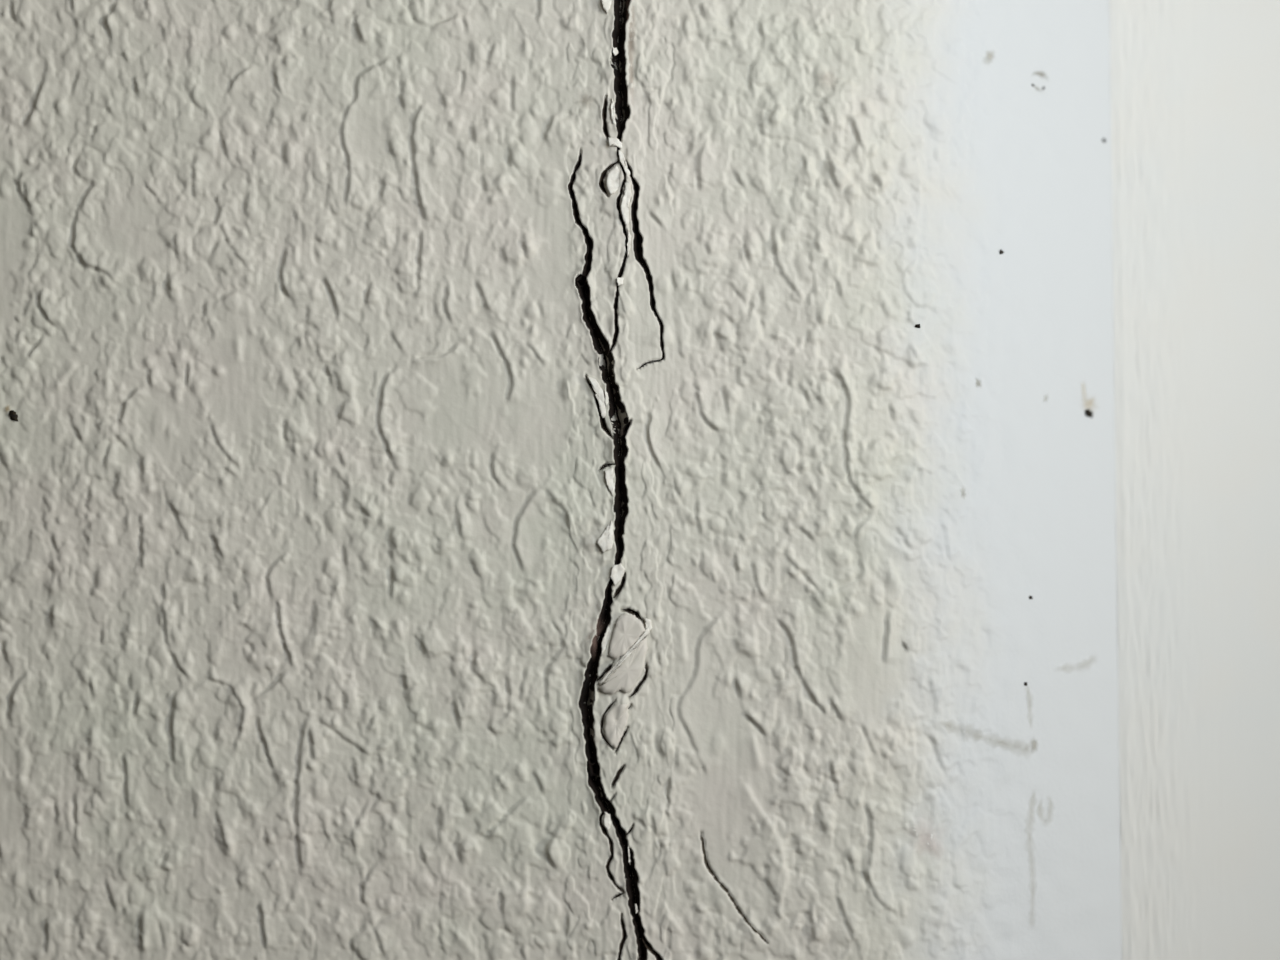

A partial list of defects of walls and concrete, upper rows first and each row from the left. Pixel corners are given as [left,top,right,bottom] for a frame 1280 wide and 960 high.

crack [568,0,665,960]